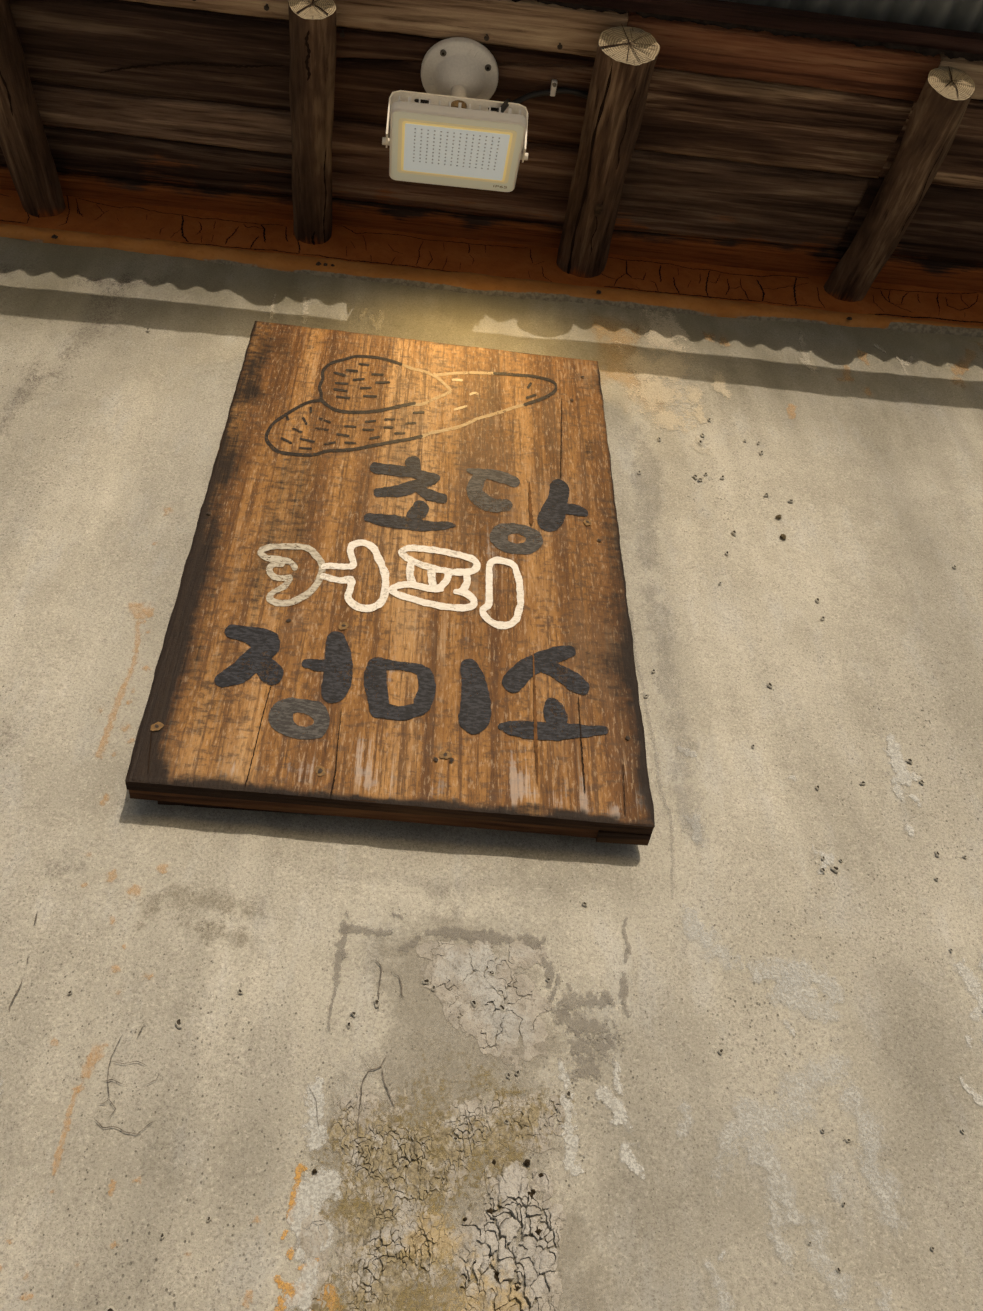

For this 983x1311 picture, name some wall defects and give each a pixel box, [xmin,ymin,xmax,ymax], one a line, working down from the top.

crack [61,195,552,282]
crack [602,257,825,308]
crack [872,287,983,323]
crack [357,1057,414,1139]
corrosion [274,1164,343,1311]